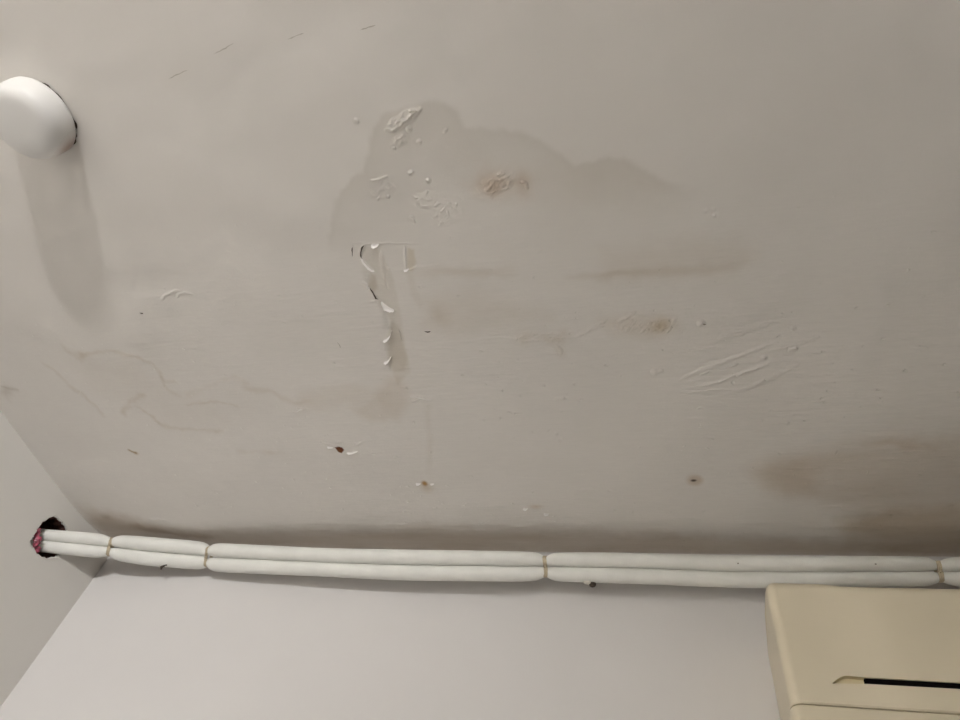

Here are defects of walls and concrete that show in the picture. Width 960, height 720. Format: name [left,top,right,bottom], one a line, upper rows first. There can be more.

water stain [324,96,769,292]
peeling [344,241,423,380]
water stain [39,341,437,481]
water stain [72,425,960,556]